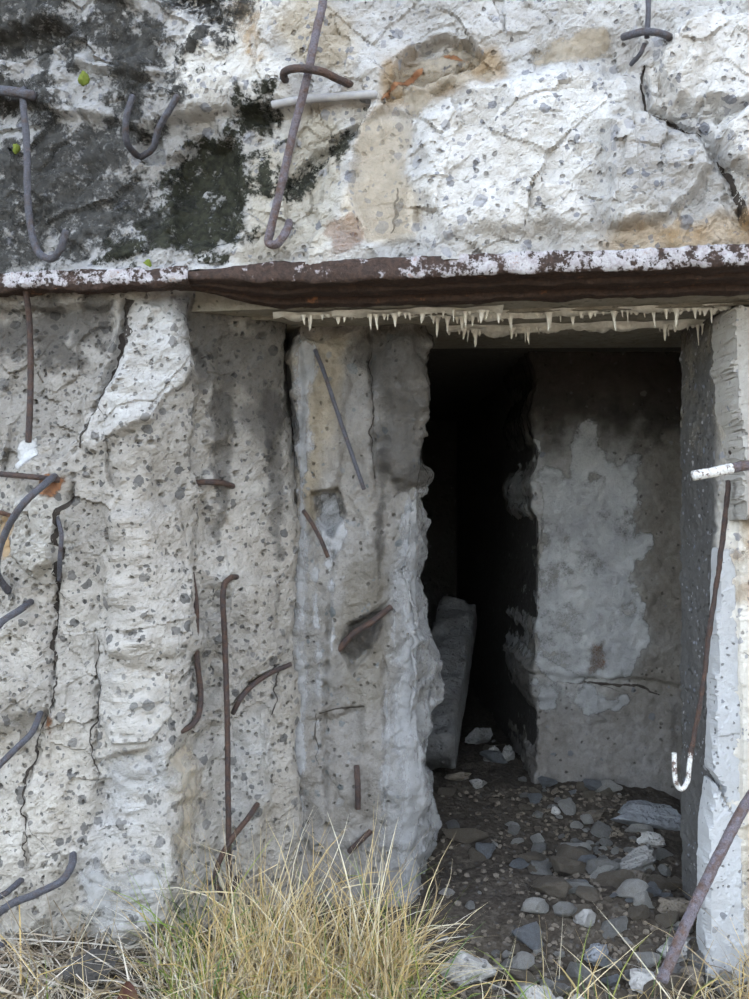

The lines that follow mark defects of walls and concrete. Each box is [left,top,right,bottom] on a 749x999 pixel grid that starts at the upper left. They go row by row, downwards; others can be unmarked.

water stain [34,49,54,84]
water stain [180,25,211,70]
spalling [381,42,479,100]
crack [640,65,701,137]
crack [716,162,749,230]
water stain [273,303,733,628]
spalling [343,610,383,660]
water stain [294,627,335,775]